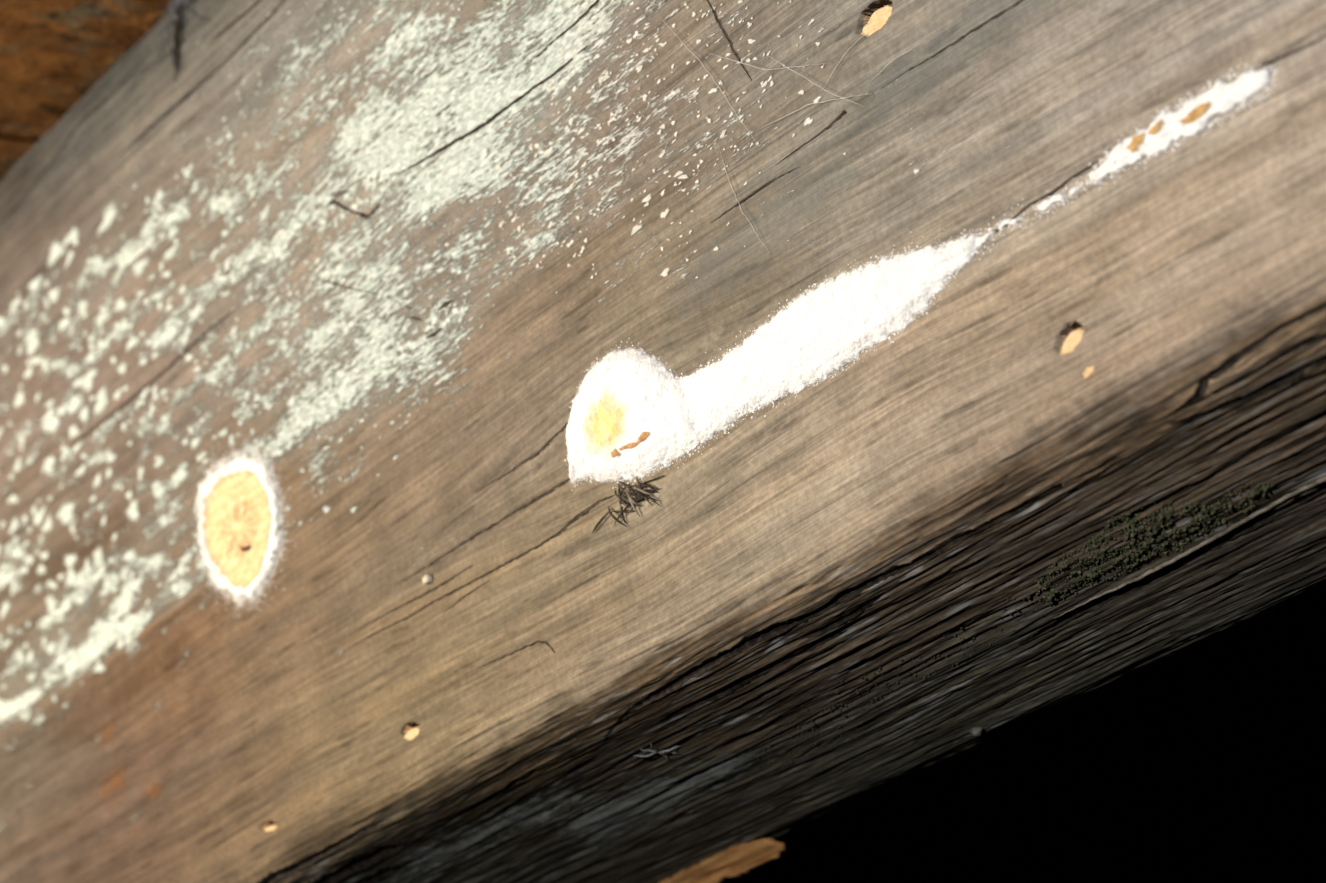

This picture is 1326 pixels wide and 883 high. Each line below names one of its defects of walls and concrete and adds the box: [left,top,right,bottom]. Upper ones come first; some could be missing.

crack [325,0,602,218]
crack [707,0,752,82]
water stain [564,49,1283,491]
crack [1168,303,1326,425]
water stain [187,435,294,629]
crack [258,819,427,883]